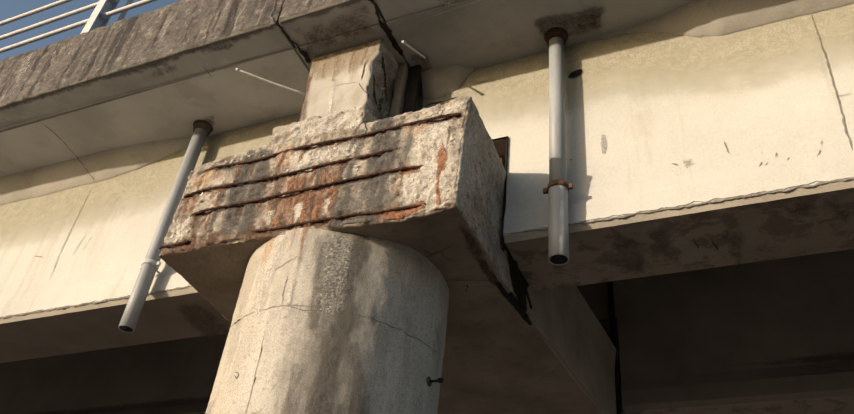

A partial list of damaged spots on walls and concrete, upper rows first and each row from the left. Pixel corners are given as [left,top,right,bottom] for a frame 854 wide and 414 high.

water stain [0,147,188,233]
water stain [195,113,327,235]
crack [271,0,311,63]
rust [160,116,461,265]
spalling [159,102,467,249]
water stain [306,7,412,228]
crack [327,0,403,139]
water stain [431,51,549,106]
water stain [535,4,854,90]
crack [811,14,853,150]
crack [229,253,438,353]
crack [245,332,265,414]